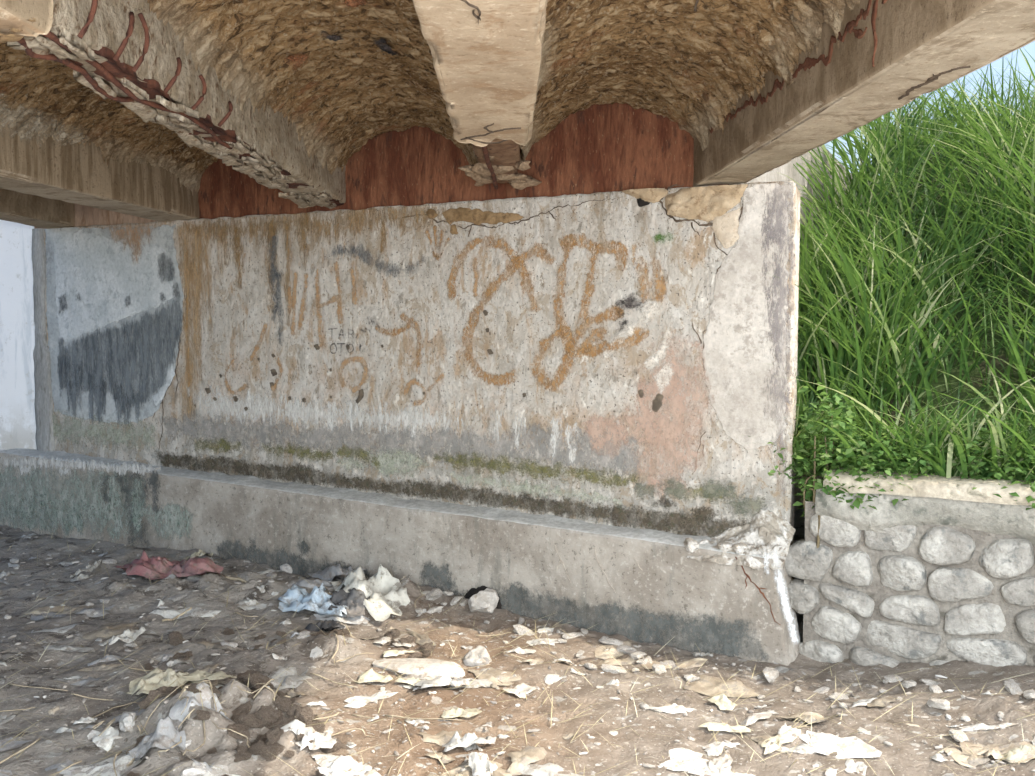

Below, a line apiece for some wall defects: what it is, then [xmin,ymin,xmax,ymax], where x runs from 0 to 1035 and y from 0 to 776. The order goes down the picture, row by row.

crack [461,0,481,23]
spalling [0,0,344,209]
crack [460,123,521,144]
spalling [459,146,542,190]
crack [709,0,887,134]
crack [898,66,971,100]
flaking render [45,224,184,424]
water stain [764,192,796,415]
water stain [161,389,687,500]
water stain [102,464,160,545]
water stain [702,480,765,515]
spalling [684,509,796,570]